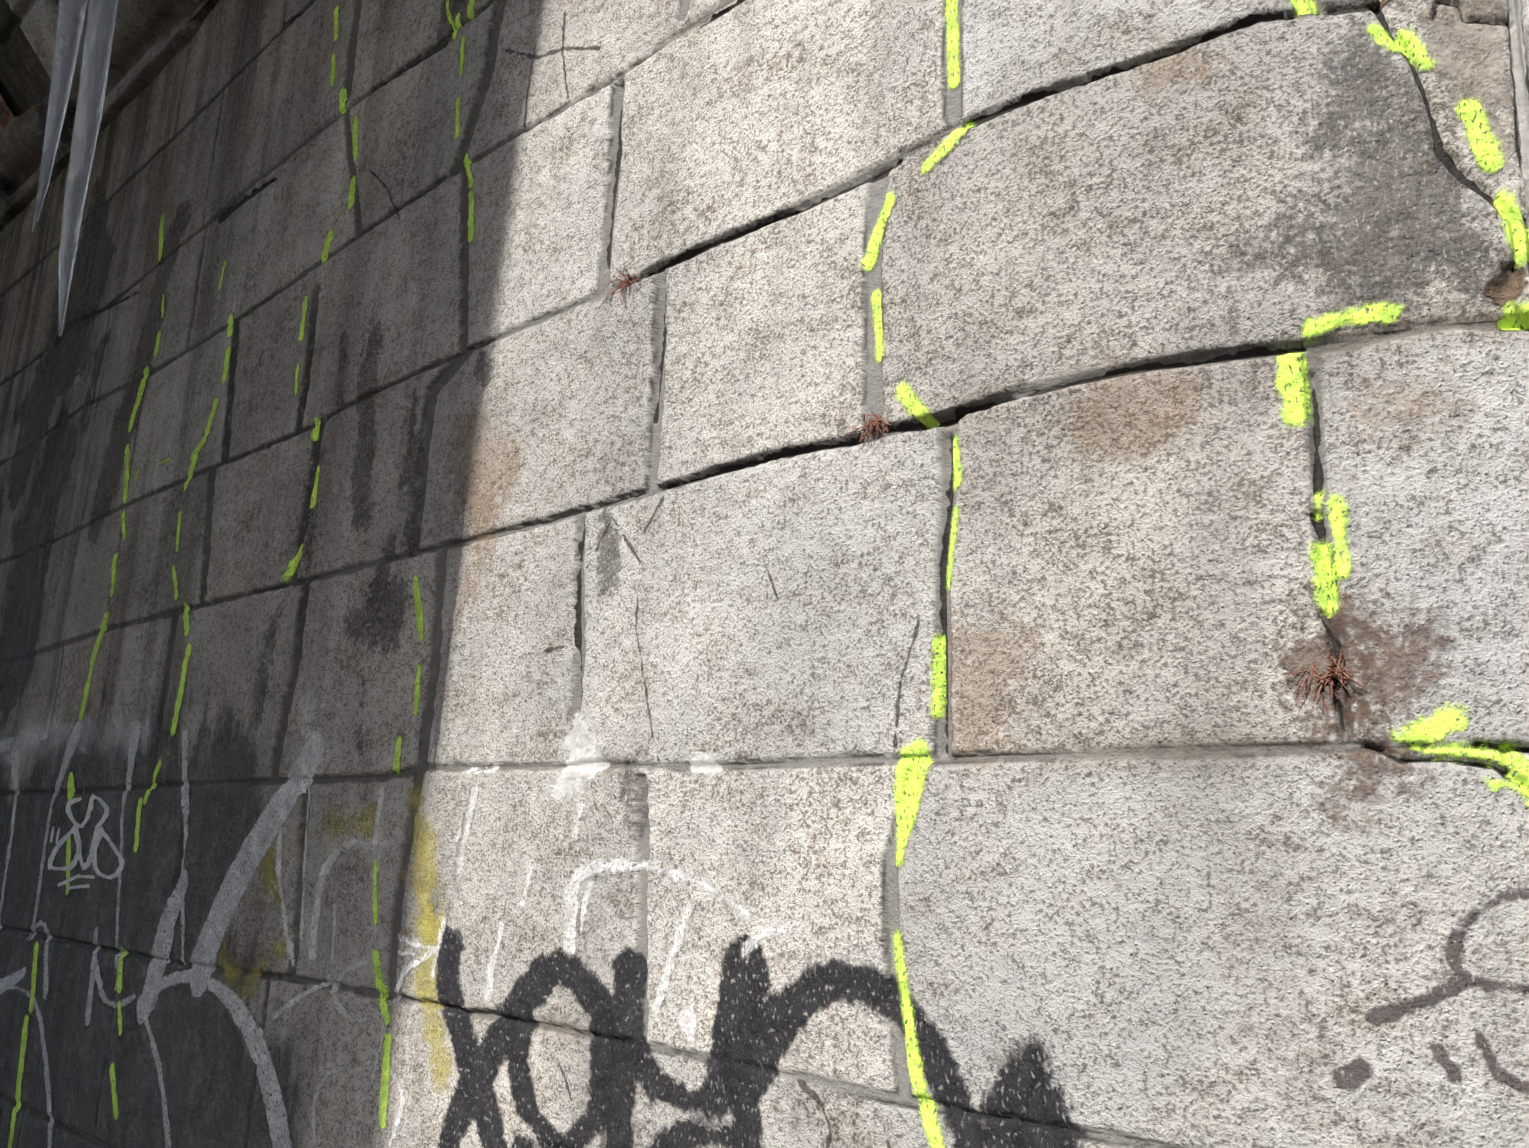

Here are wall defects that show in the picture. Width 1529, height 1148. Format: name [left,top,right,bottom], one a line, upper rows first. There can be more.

crack [1324,1,1529,272]
leakage [0,176,114,726]
leakage [87,200,192,541]
leakage [303,445,323,573]
leakage [250,608,282,730]
crack [1365,742,1529,792]